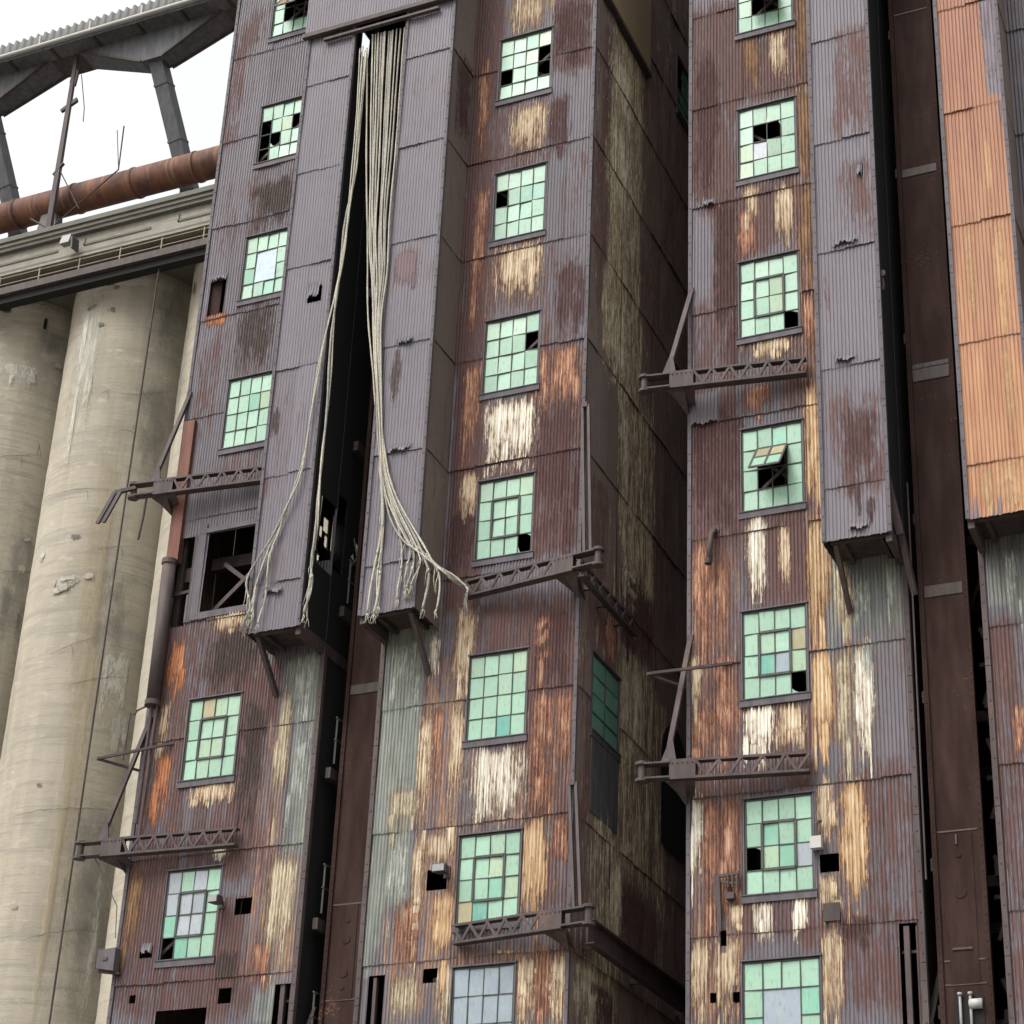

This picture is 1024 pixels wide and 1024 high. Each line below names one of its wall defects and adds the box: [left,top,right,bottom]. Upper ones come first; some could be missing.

peeling [505,98,552,159]
rust [204,301,276,374]
rust [458,353,482,477]
spalling [52,573,94,594]
rust [166,639,187,703]
rust [526,608,576,862]
peeling [739,377,876,1024]
rust [148,748,174,828]
peeling [386,604,552,1024]